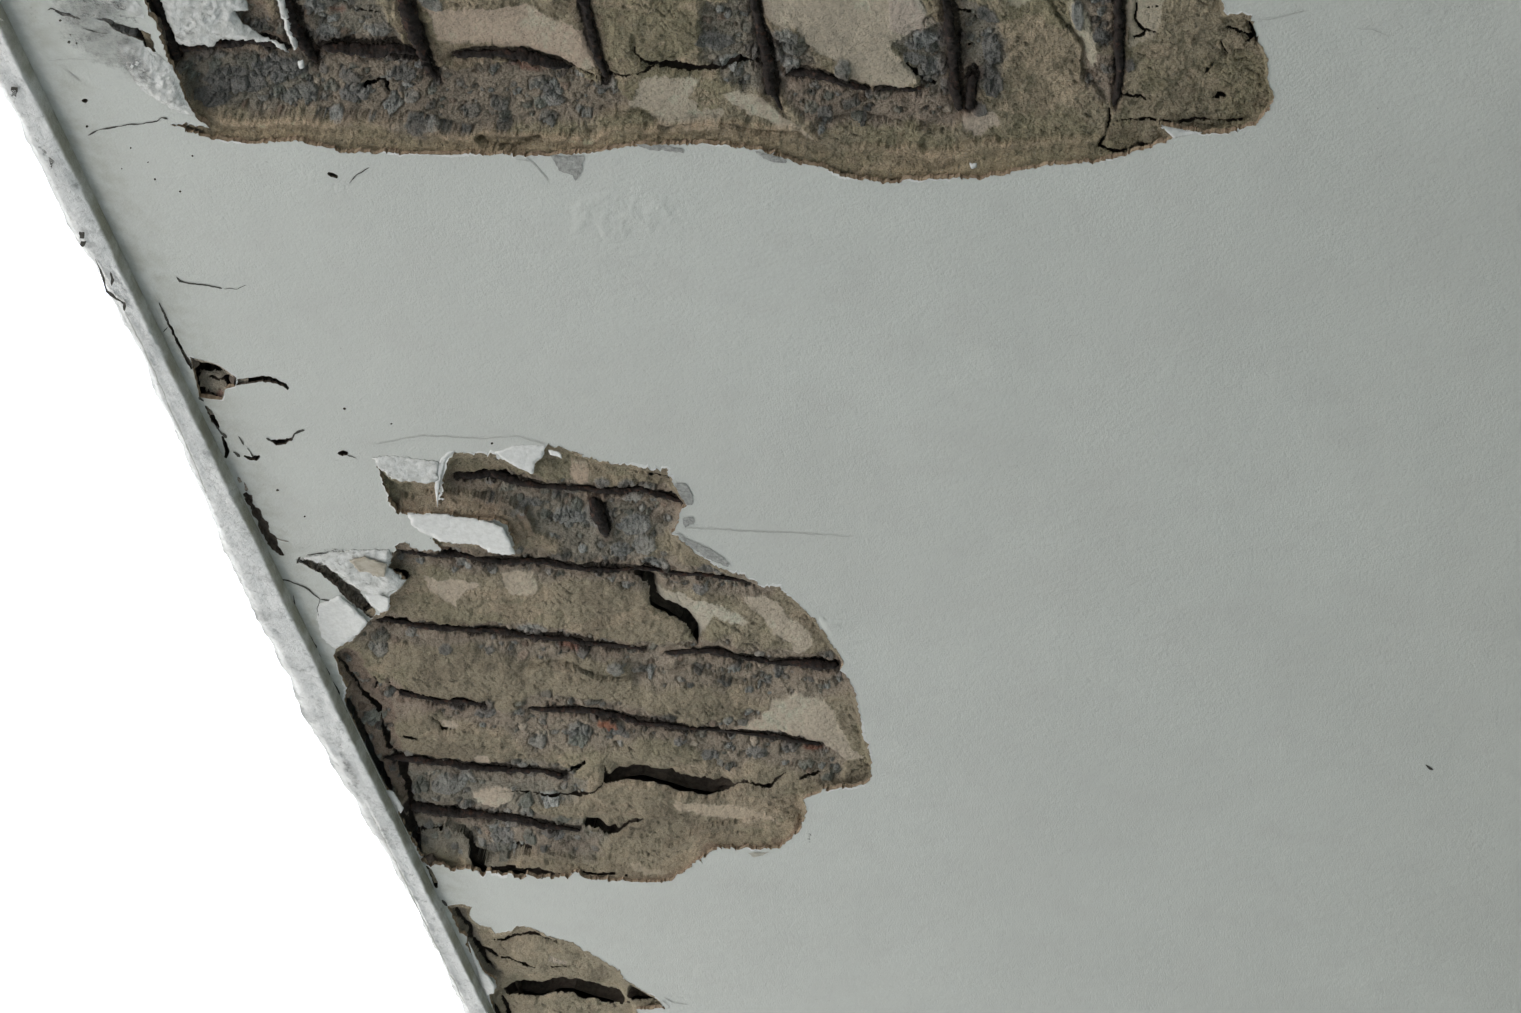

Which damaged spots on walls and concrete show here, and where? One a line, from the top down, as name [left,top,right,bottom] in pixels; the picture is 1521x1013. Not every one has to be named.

spalling [97,0,1274,184]
spalling [182,349,289,415]
spalling [297,443,873,883]
spalling [447,904,665,1013]